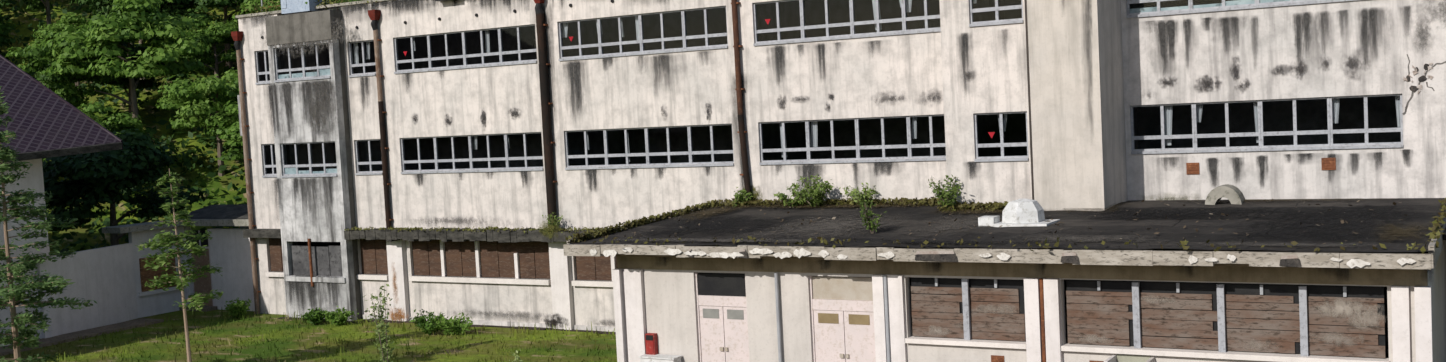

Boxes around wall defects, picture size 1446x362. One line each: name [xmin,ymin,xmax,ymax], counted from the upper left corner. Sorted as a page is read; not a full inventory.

water stain [268,81,333,130]
water stain [542,8,581,102]
water stain [1158,18,1237,86]
water stain [1197,58,1249,91]
water stain [1294,13,1324,74]
water stain [1362,9,1383,51]
crack [1402,54,1446,115]
peeling [589,247,633,257]
peeling [664,248,848,260]
spalling [915,251,957,262]
peeling [1188,254,1236,264]
peeling [1330,257,1370,268]